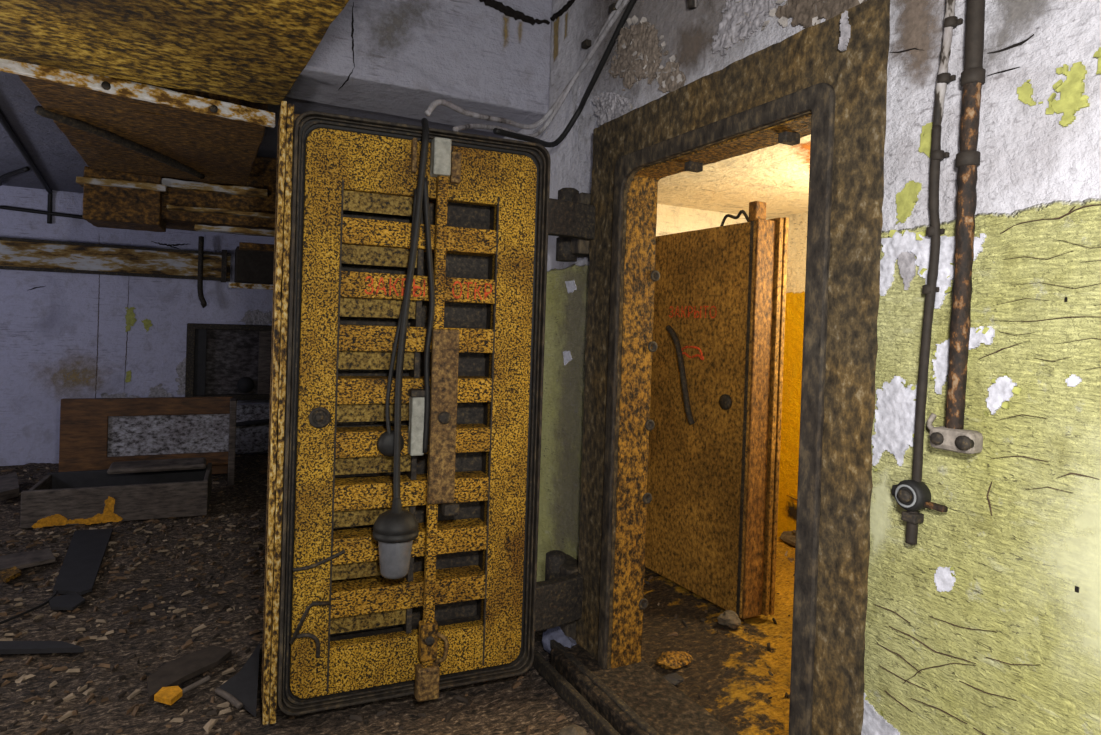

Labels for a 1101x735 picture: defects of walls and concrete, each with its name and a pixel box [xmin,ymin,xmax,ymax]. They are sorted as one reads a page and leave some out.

spalling [711,0,867,56]
peeling [1017,47,1101,127]
peeling [880,180,955,309]
crack [978,204,1101,370]
peeling [872,376,917,471]
peeling [931,339,950,394]
peeling [969,326,995,350]
peeling [984,373,1021,416]
crack [987,456,1100,516]
peeling [934,566,956,592]
crack [875,604,1041,735]
peeling [861,693,900,735]